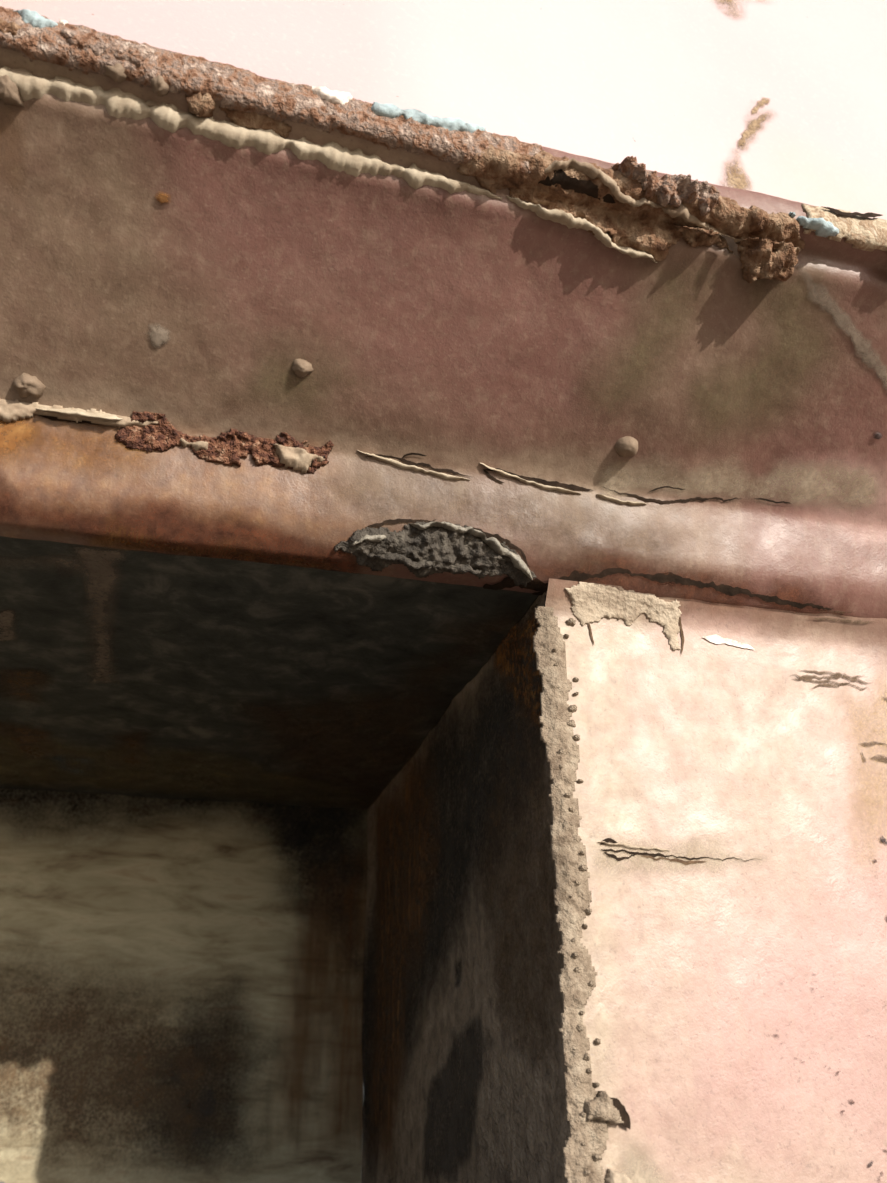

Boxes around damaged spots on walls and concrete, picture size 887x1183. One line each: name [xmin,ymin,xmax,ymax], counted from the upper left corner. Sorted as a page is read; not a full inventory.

corrosion [0,6,542,175]
corrosion [612,156,724,247]
corrosion [789,203,887,252]
corrosion [739,237,801,282]
corrosion [0,419,36,455]
corrosion [115,411,334,474]
crack [358,450,791,506]
corrosion [0,490,357,574]
peeling [565,582,684,655]
crack [483,568,832,610]
crack [597,838,751,865]
damp [423,1021,482,1178]